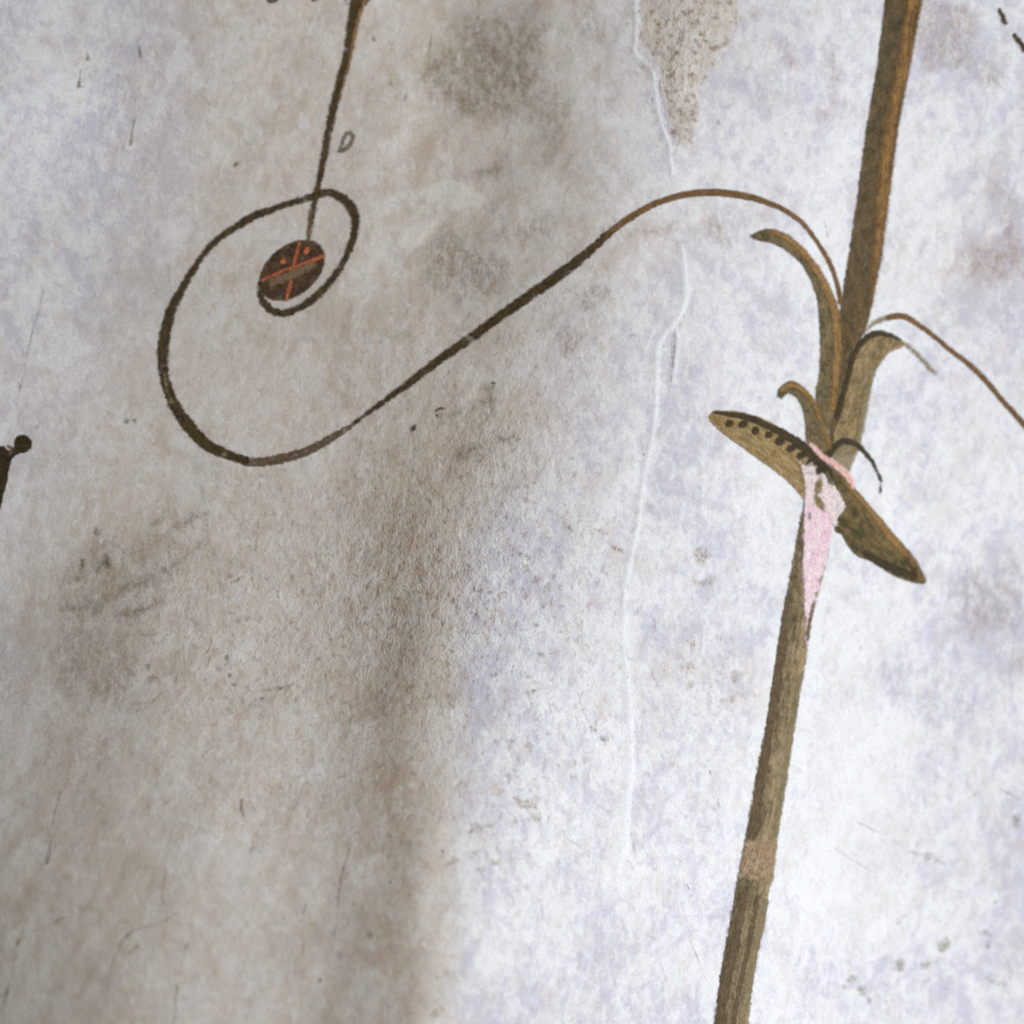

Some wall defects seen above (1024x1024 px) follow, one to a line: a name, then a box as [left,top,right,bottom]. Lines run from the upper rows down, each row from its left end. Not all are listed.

crack [628,0,678,178]
peeling [624,0,754,162]
crack [610,241,694,889]